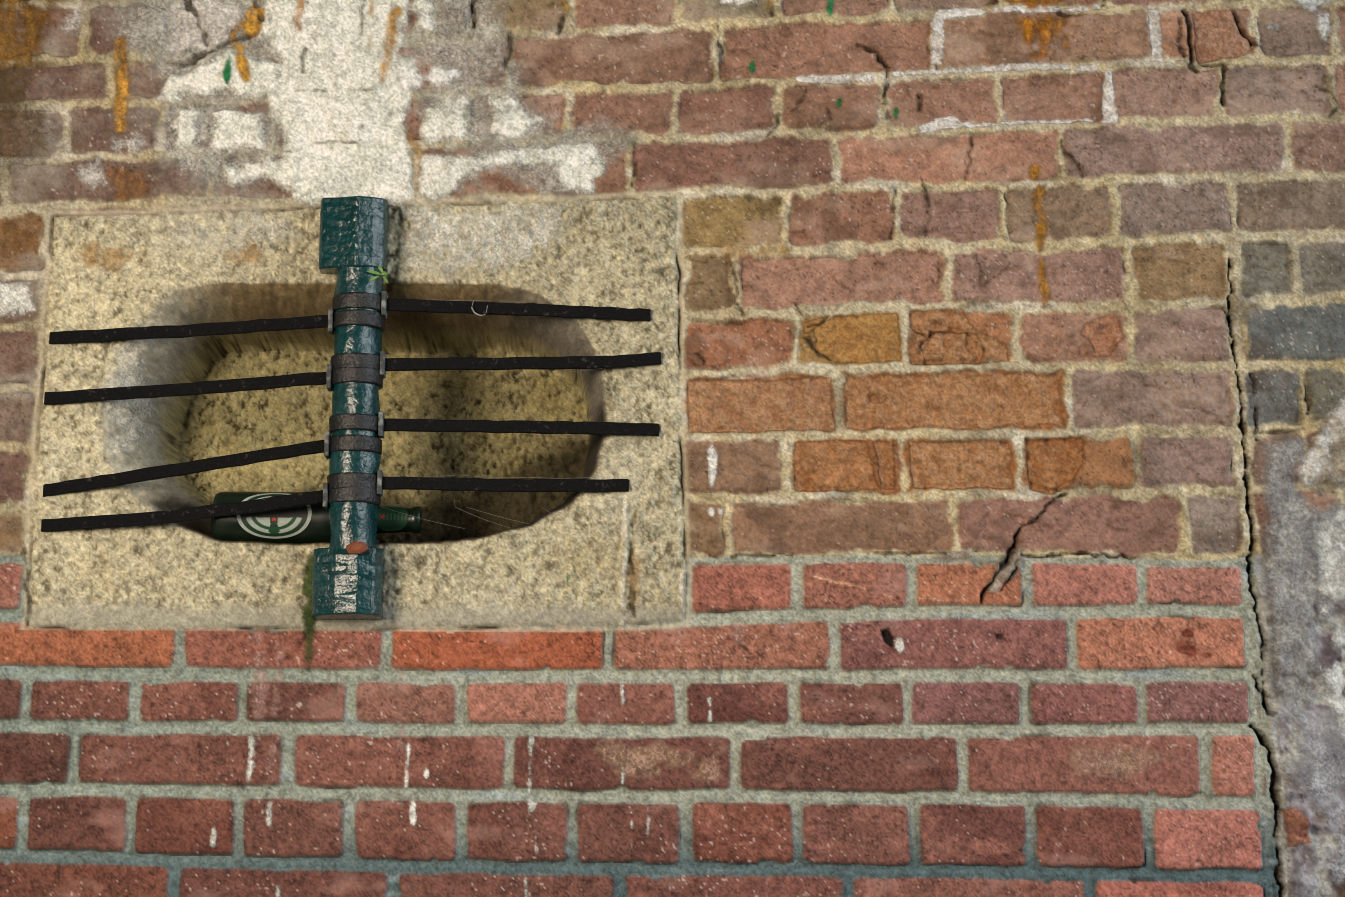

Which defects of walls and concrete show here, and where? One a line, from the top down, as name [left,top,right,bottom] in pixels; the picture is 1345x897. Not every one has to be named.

leakage [0,0,83,150]
leakage [78,157,147,200]
leakage [112,0,279,182]
crack [182,0,263,67]
crack [469,0,477,27]
leakage [381,0,626,276]
crack [503,32,511,66]
rust [990,0,1070,59]
rust [1029,164,1050,304]
efflorescence [105,340,154,454]
crack [980,493,1127,603]